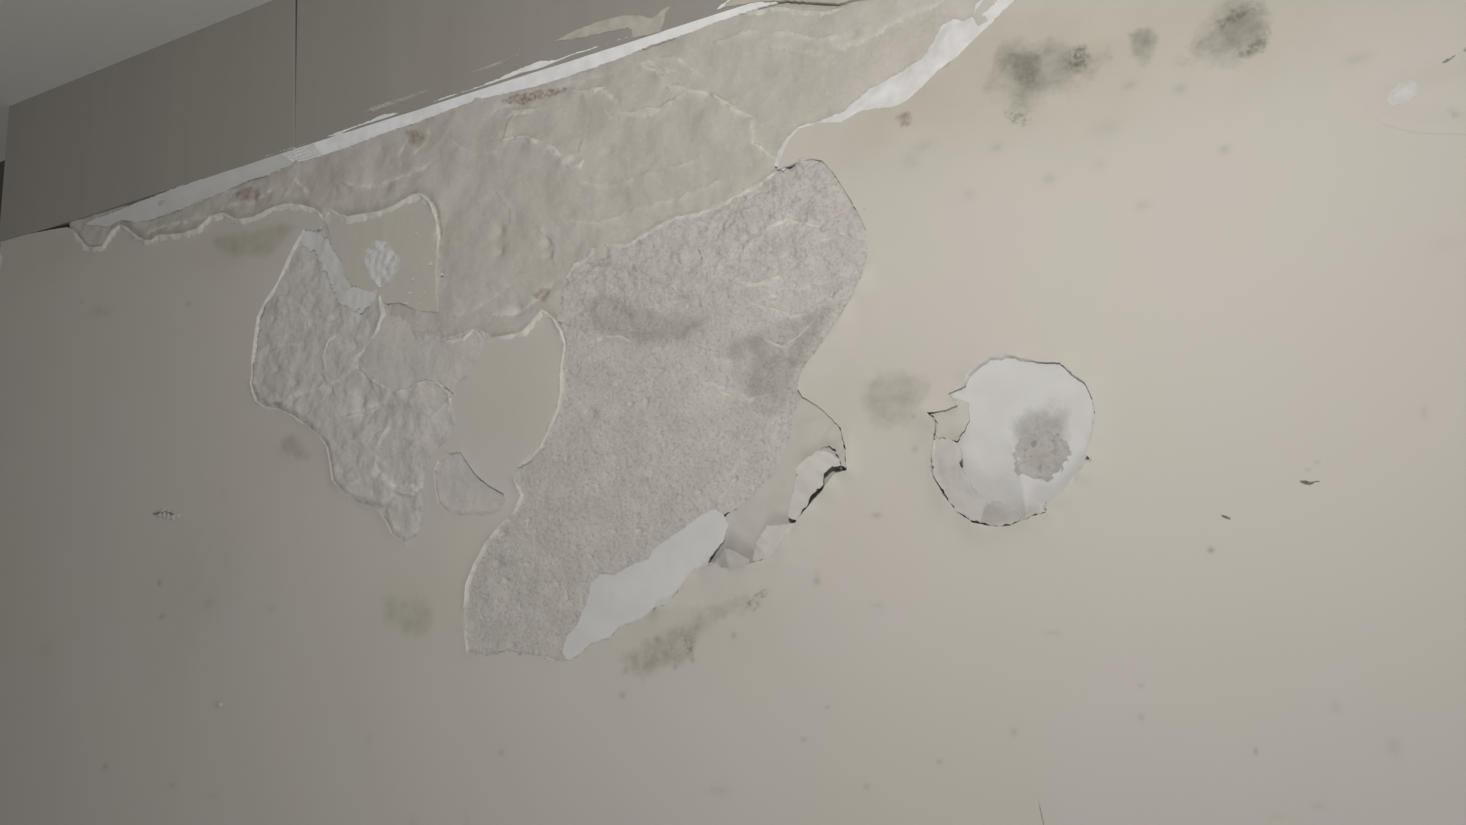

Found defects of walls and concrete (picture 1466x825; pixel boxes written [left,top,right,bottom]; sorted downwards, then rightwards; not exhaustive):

peeling [70,0,1014,662]
spalling [928,354,1095,526]